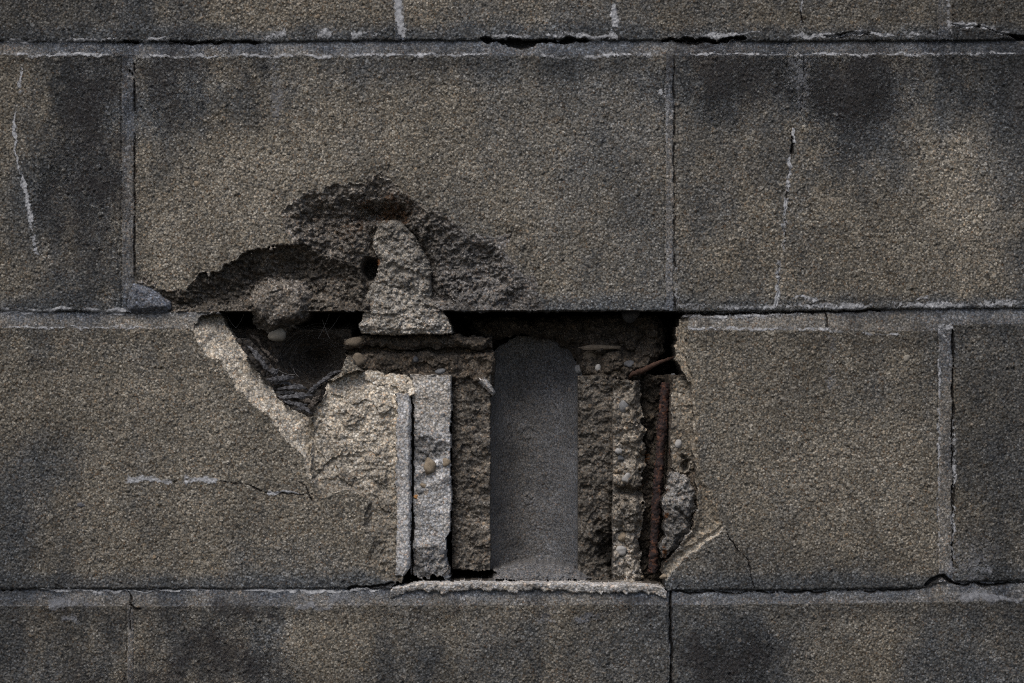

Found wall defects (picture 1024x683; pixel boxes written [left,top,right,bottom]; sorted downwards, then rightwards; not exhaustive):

crack [775,137,795,310]
spalling [137,171,544,591]
crack [220,481,313,502]